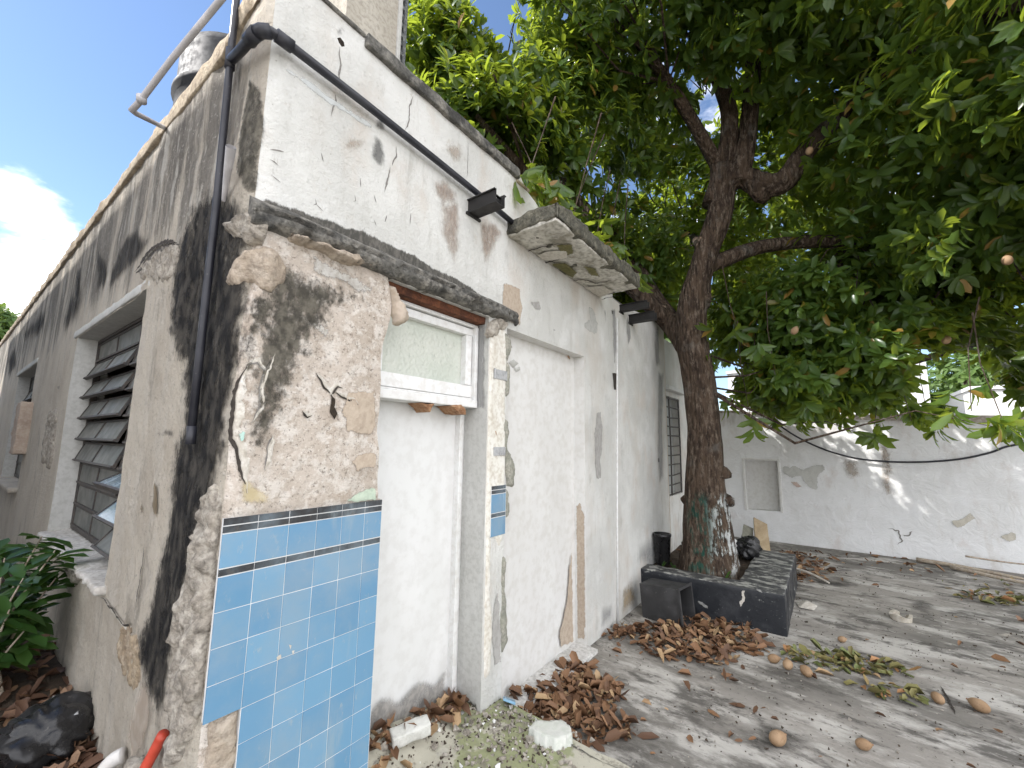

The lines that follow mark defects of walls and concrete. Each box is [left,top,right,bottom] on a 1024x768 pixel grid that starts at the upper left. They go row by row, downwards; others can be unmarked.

leakage [237,80,264,191]
leakage [65,270,80,328]
leakage [97,232,148,286]
spalling [226,246,286,293]
spalling [287,233,372,266]
leakage [264,199,480,295]
leakage [128,192,372,756]
crack [228,355,275,493]
crack [316,373,358,405]
peeling [477,283,523,679]
spalling [162,483,238,768]
peeling [559,503,585,646]